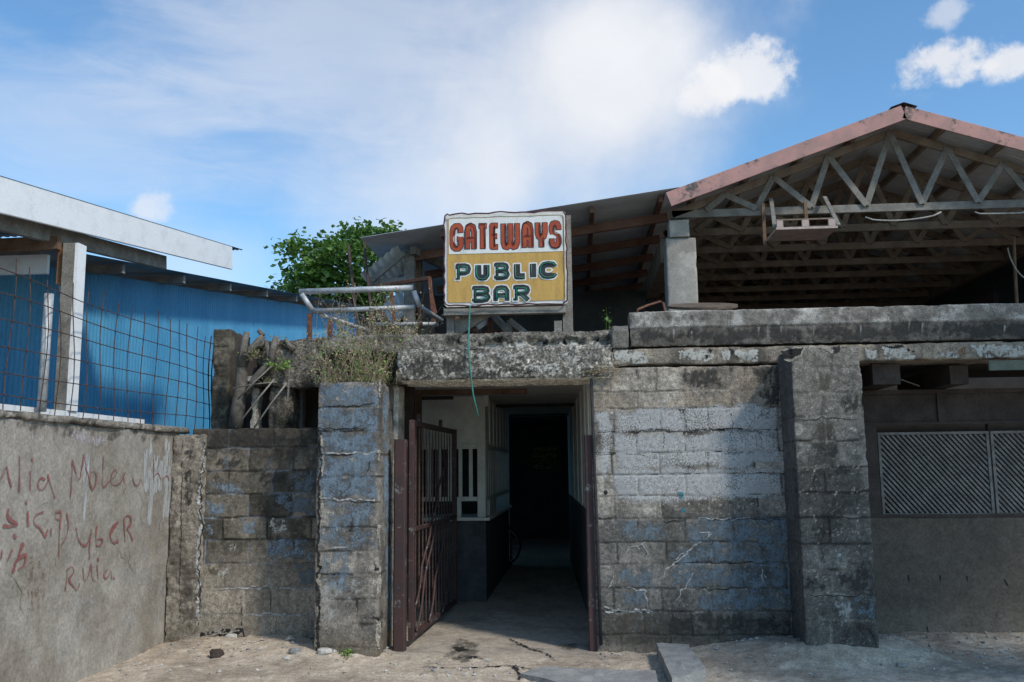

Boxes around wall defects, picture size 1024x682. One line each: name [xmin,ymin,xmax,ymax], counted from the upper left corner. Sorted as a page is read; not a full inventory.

peeling [614,350,648,364]
peeling [679,348,759,362]
spalling [780,345,840,362]
peeling [865,345,915,360]
peeling [971,344,1024,358]
water stain [683,368,721,387]
water stain [754,366,780,407]
crack [608,516,863,604]